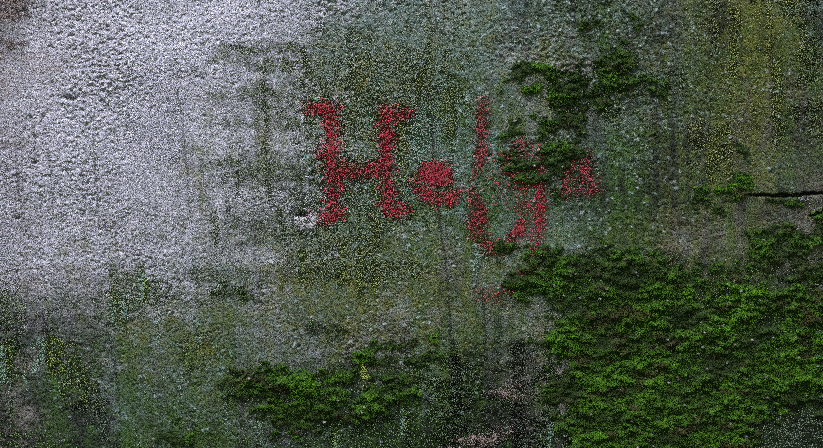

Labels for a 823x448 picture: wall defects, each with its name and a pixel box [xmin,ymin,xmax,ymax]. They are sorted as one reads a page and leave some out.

crack [742,191,823,216]
leakage [448,338,565,448]